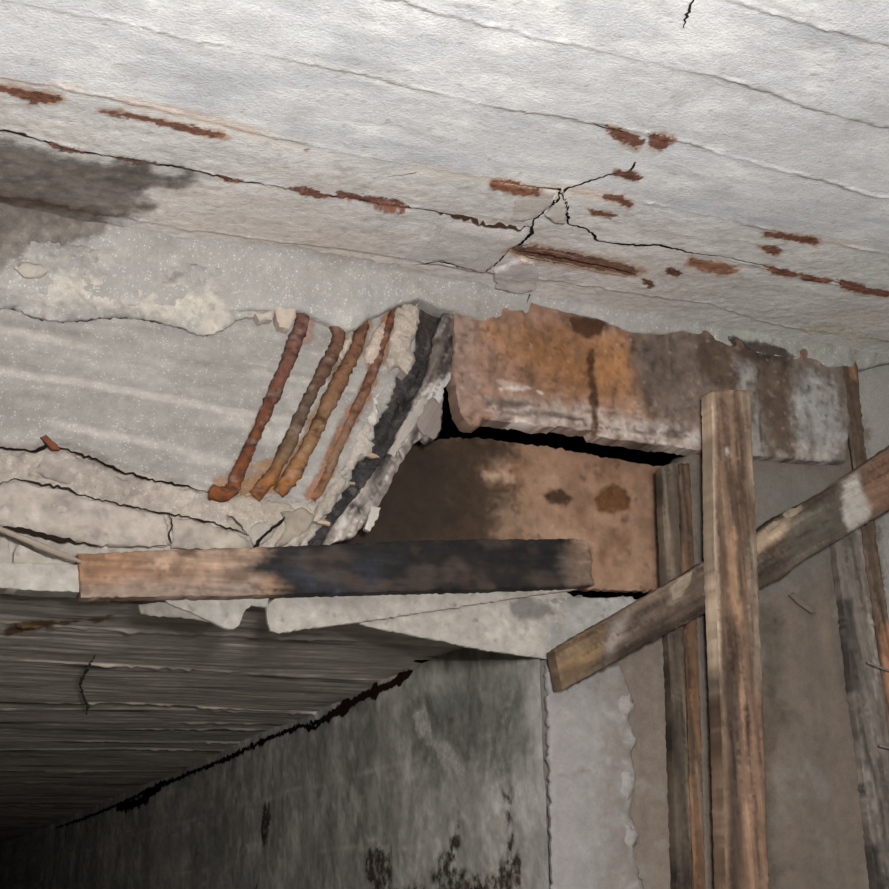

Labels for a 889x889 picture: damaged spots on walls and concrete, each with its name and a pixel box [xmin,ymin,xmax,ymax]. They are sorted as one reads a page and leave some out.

leakage [0,139,194,265]
peeling [0,240,297,337]
crack [0,129,298,191]
corrosion [100,109,229,140]
corrosion [505,243,655,289]
crack [407,162,791,272]
corrosion [760,232,889,297]
spalling [363,304,420,380]
spalling [0,393,380,550]
corrosion [208,306,401,502]
spalling [434,387,680,466]
crack [56,669,413,828]